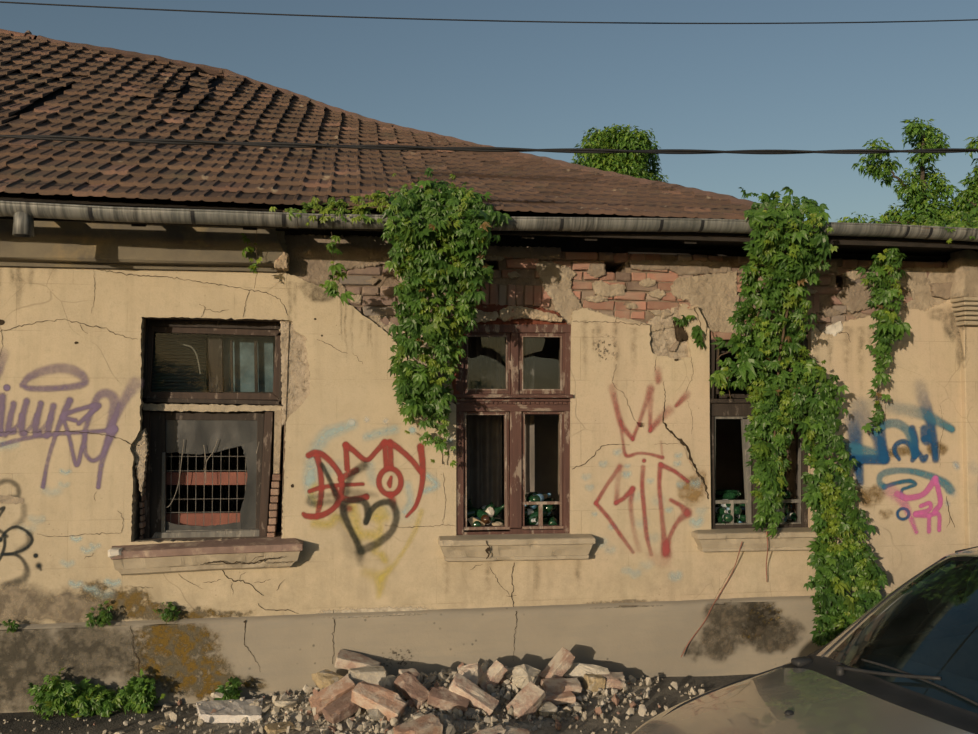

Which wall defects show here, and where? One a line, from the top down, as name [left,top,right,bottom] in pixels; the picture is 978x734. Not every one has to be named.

crack [0,269,288,355]
flaking render [274,234,952,403]
spalling [132,428,149,496]
spalling [279,320,310,427]
crack [573,364,639,469]
crack [655,357,709,499]
crack [183,556,299,670]
crack [474,541,517,656]
leakage [687,602,797,659]